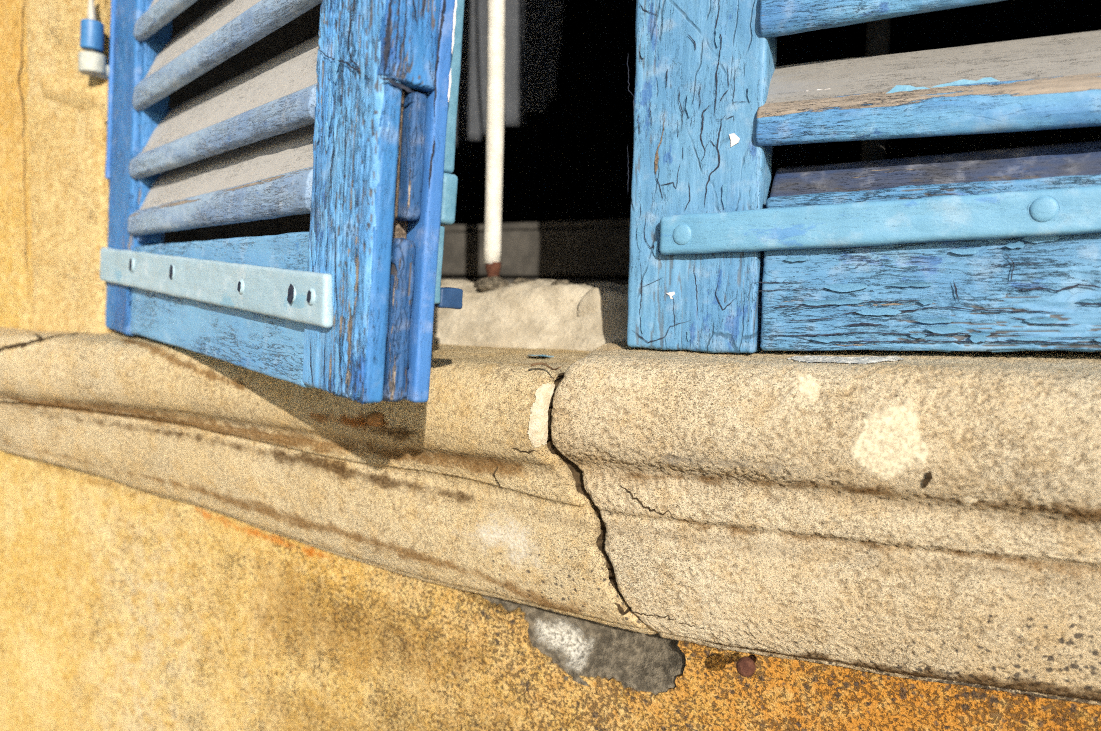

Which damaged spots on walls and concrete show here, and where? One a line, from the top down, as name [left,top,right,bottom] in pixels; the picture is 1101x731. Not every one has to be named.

damp [275,452,345,476]
crack [493,372,713,632]
flaking render [481,594,686,695]
damp [956,676,1101,702]